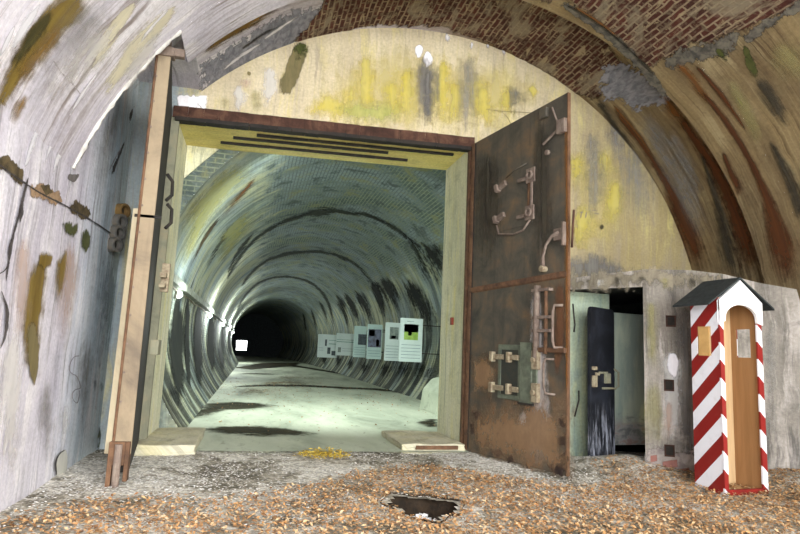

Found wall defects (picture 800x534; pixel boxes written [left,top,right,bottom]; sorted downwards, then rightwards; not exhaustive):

water stain [0,0,135,118]
water stain [106,7,175,91]
water stain [383,45,490,123]
flaking render [177,0,800,113]
spalling [0,155,111,234]
corrosion [598,103,709,261]
corrosion [665,65,800,280]
corrosion [472,398,573,471]